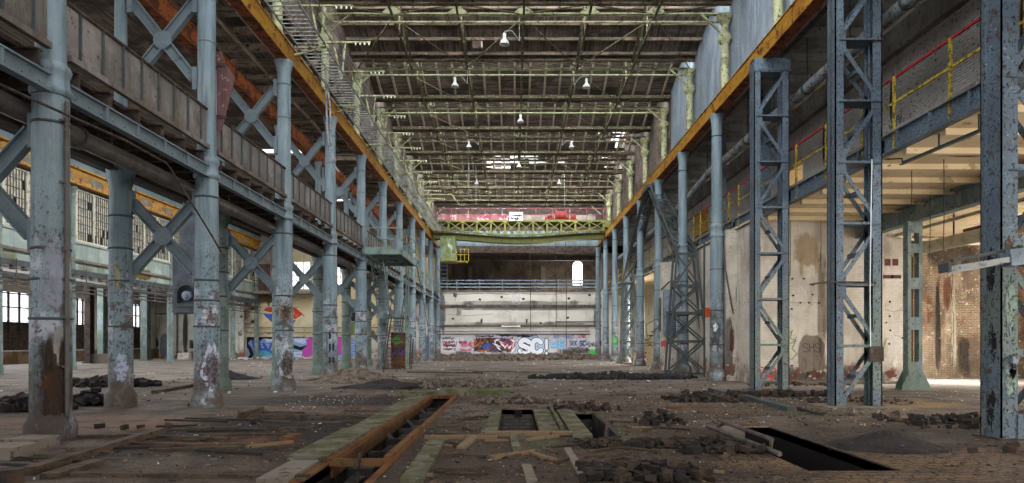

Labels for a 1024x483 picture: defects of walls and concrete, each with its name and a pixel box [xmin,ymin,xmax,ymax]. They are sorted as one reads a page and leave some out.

corrosion [38,327,64,417]
peeling [113,351,131,383]
peeling [174,340,221,392]
corrosion [282,351,293,379]
damp [769,234,827,381]
damp [935,277,970,375]